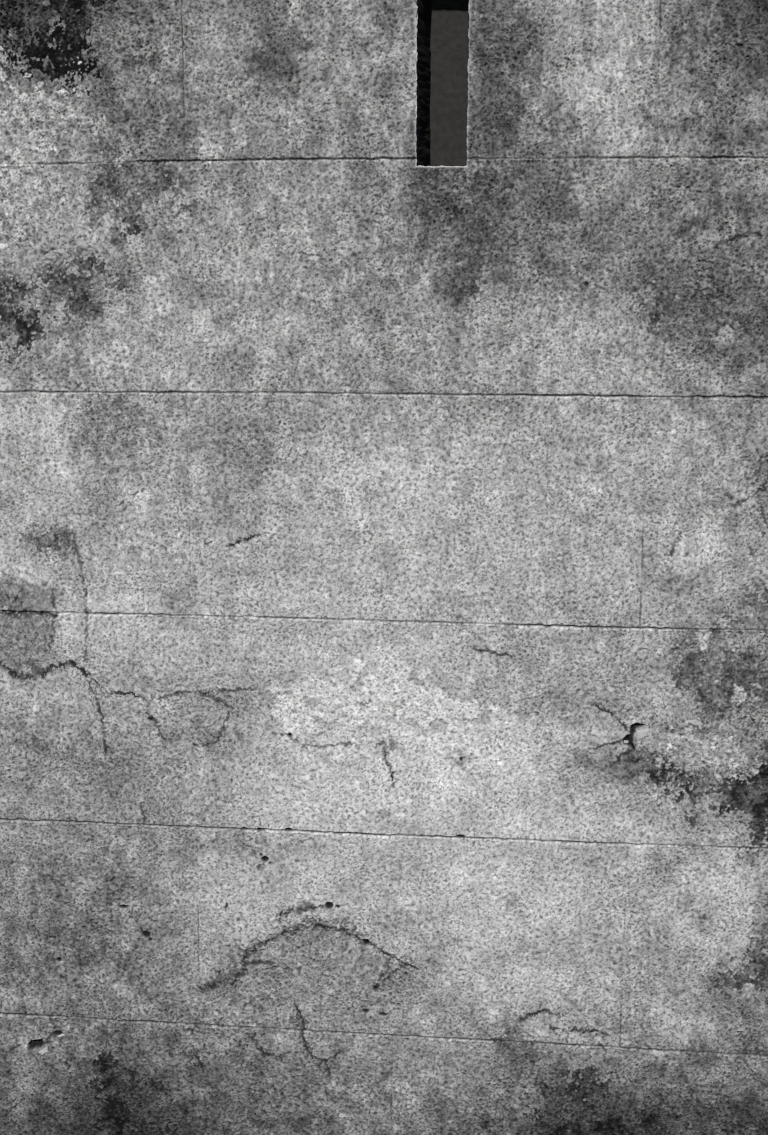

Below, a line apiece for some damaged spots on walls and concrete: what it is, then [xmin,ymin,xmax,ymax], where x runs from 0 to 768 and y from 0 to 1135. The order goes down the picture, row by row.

crack [0,533,261,755]
spalling [591,704,649,763]